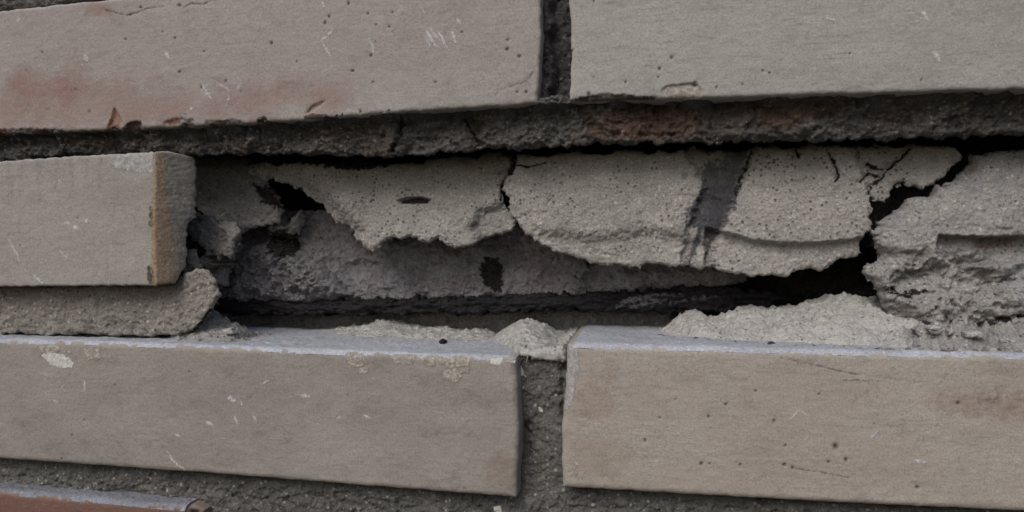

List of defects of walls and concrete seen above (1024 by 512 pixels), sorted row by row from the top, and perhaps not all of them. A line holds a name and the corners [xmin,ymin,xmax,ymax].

crack [301,114,406,170]
crack [500,162,546,201]
spalling [214,142,1024,333]
damp [688,149,752,263]
crack [795,144,980,247]